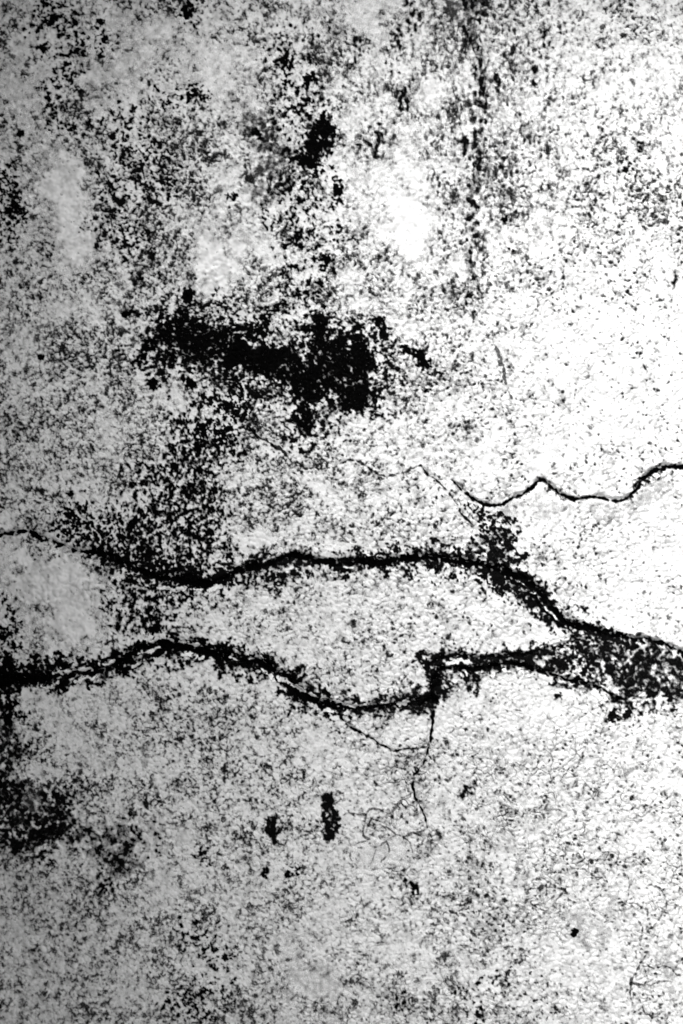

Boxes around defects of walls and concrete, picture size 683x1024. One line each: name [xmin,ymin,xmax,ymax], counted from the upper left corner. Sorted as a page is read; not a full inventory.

leakage [22,0,444,652]
crack [0,426,683,861]